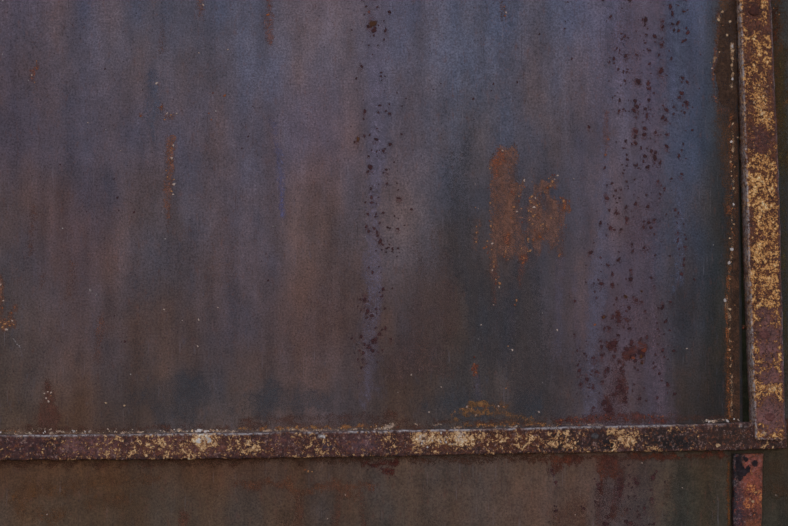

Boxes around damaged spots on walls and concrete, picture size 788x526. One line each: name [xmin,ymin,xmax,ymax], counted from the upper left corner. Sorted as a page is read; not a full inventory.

rust [753,0,788,401]
rust [0,339,730,526]